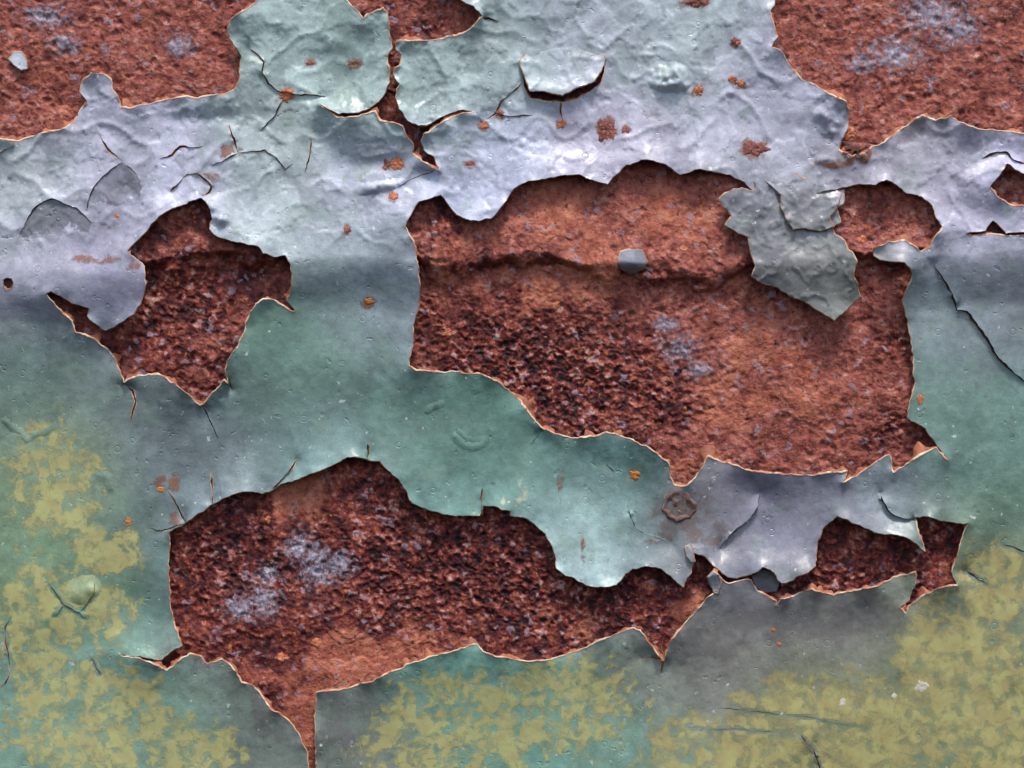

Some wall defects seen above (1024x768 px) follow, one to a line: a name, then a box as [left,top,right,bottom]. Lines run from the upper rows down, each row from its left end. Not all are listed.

corrosion [221,145,242,157]
crack [162,50,325,196]
crack [934,265,1024,382]
corrosion [119,159,969,768]
spalling [661,489,698,523]